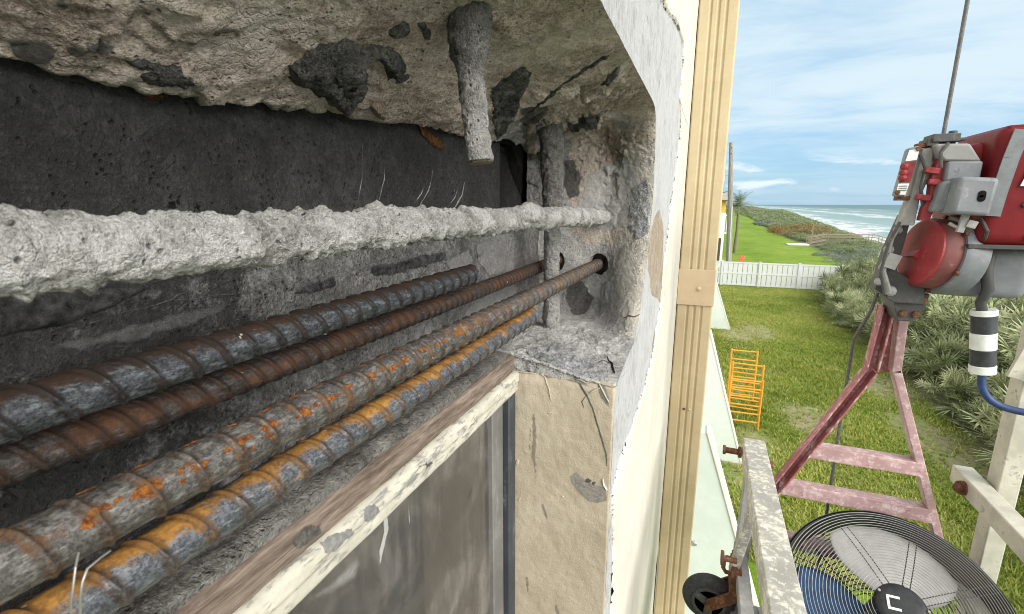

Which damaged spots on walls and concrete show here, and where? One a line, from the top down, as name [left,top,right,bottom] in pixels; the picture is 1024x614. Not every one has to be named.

spalling [0,0,664,614]